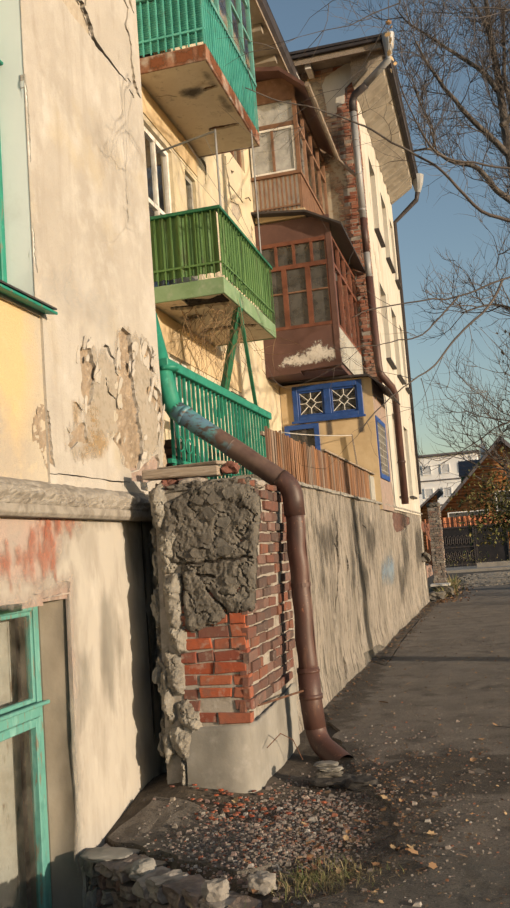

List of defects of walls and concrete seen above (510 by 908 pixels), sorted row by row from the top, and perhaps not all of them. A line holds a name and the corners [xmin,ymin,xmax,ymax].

damp [182,89,201,97]
spalling [32,404,53,468]
peeling [68,329,165,482]